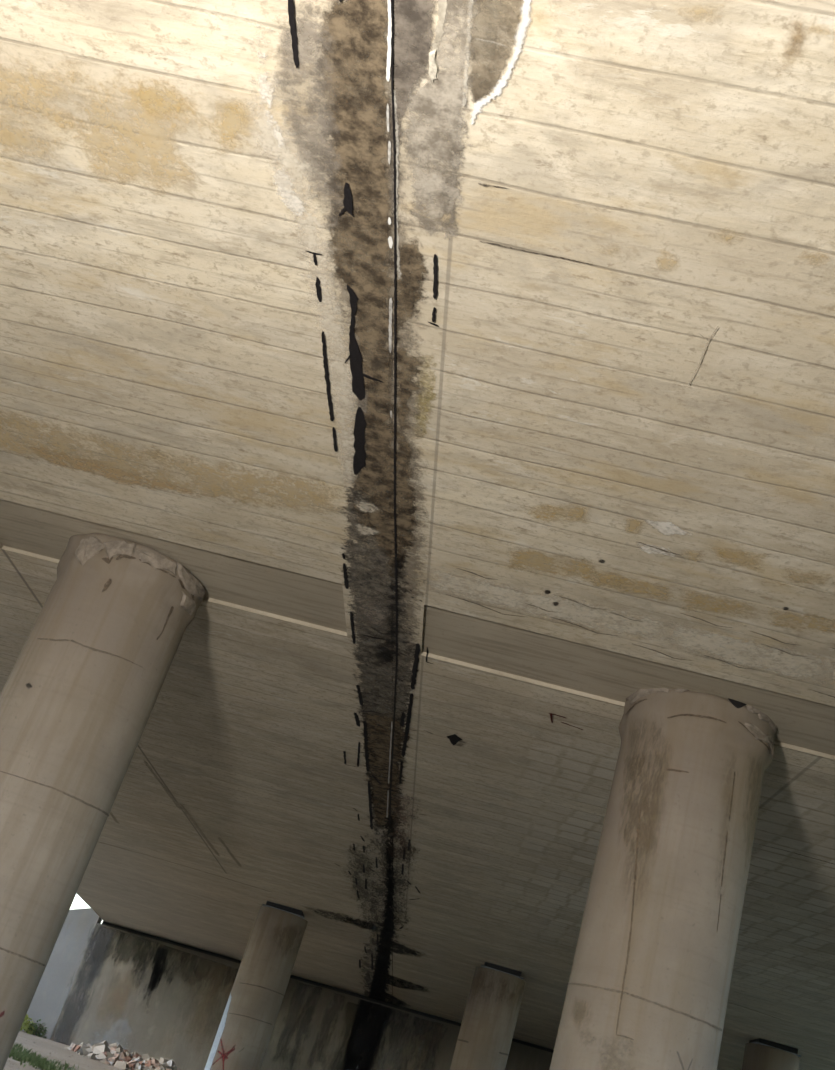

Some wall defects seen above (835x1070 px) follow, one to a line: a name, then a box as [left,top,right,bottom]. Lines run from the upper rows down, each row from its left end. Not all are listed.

water stain [469,0,531,125]
peeling [394,0,476,277]
crack [307,251,322,302]
crack [428,254,439,327]
crack [480,241,592,265]
crack [321,331,338,452]
crack [334,0,433,900]
water stain [274,0,444,1070]
water stain [53,926,239,1044]